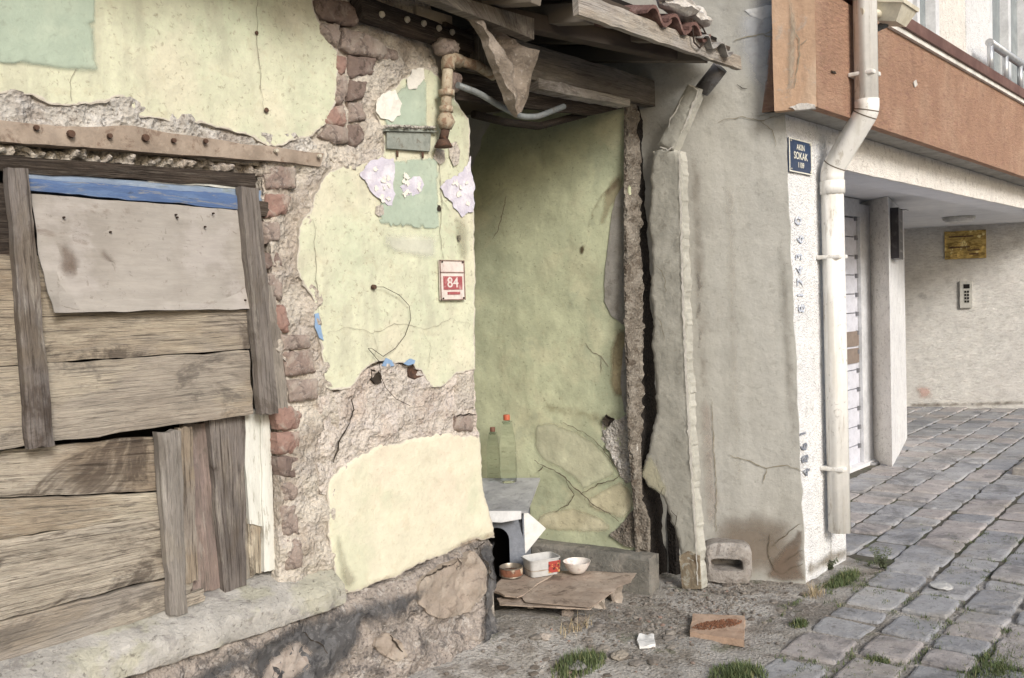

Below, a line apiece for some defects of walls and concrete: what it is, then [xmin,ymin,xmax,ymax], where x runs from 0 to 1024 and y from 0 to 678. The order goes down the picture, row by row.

spalling [0,0,479,583]
spalling [601,104,667,575]
crack [333,399,355,463]
crack [712,412,801,532]
crack [767,524,802,574]